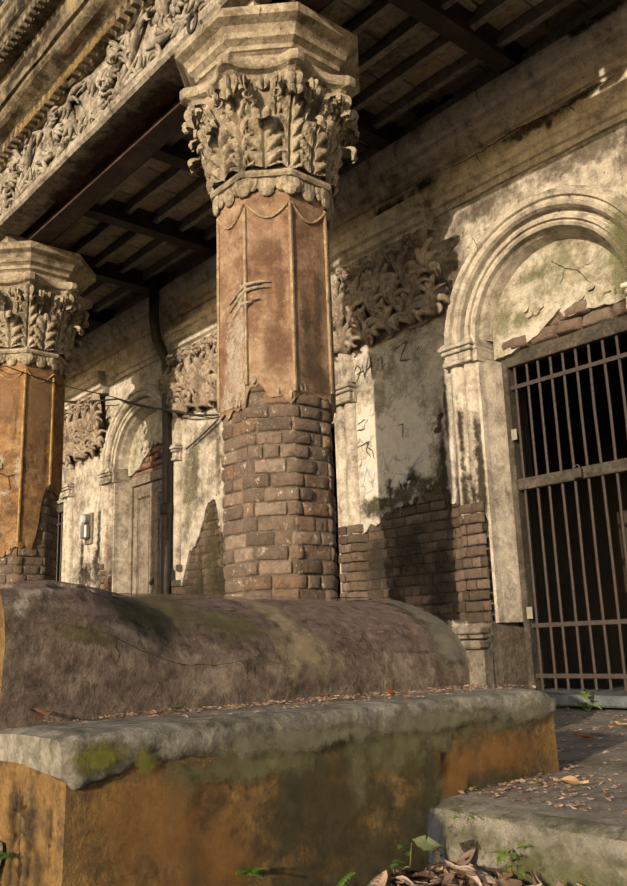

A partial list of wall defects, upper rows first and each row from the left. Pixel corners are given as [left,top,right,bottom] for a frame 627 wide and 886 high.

crack [440,118,539,172]
spalling [502,283,627,351]
spalling [0,285,493,672]
water stain [440,384,488,531]